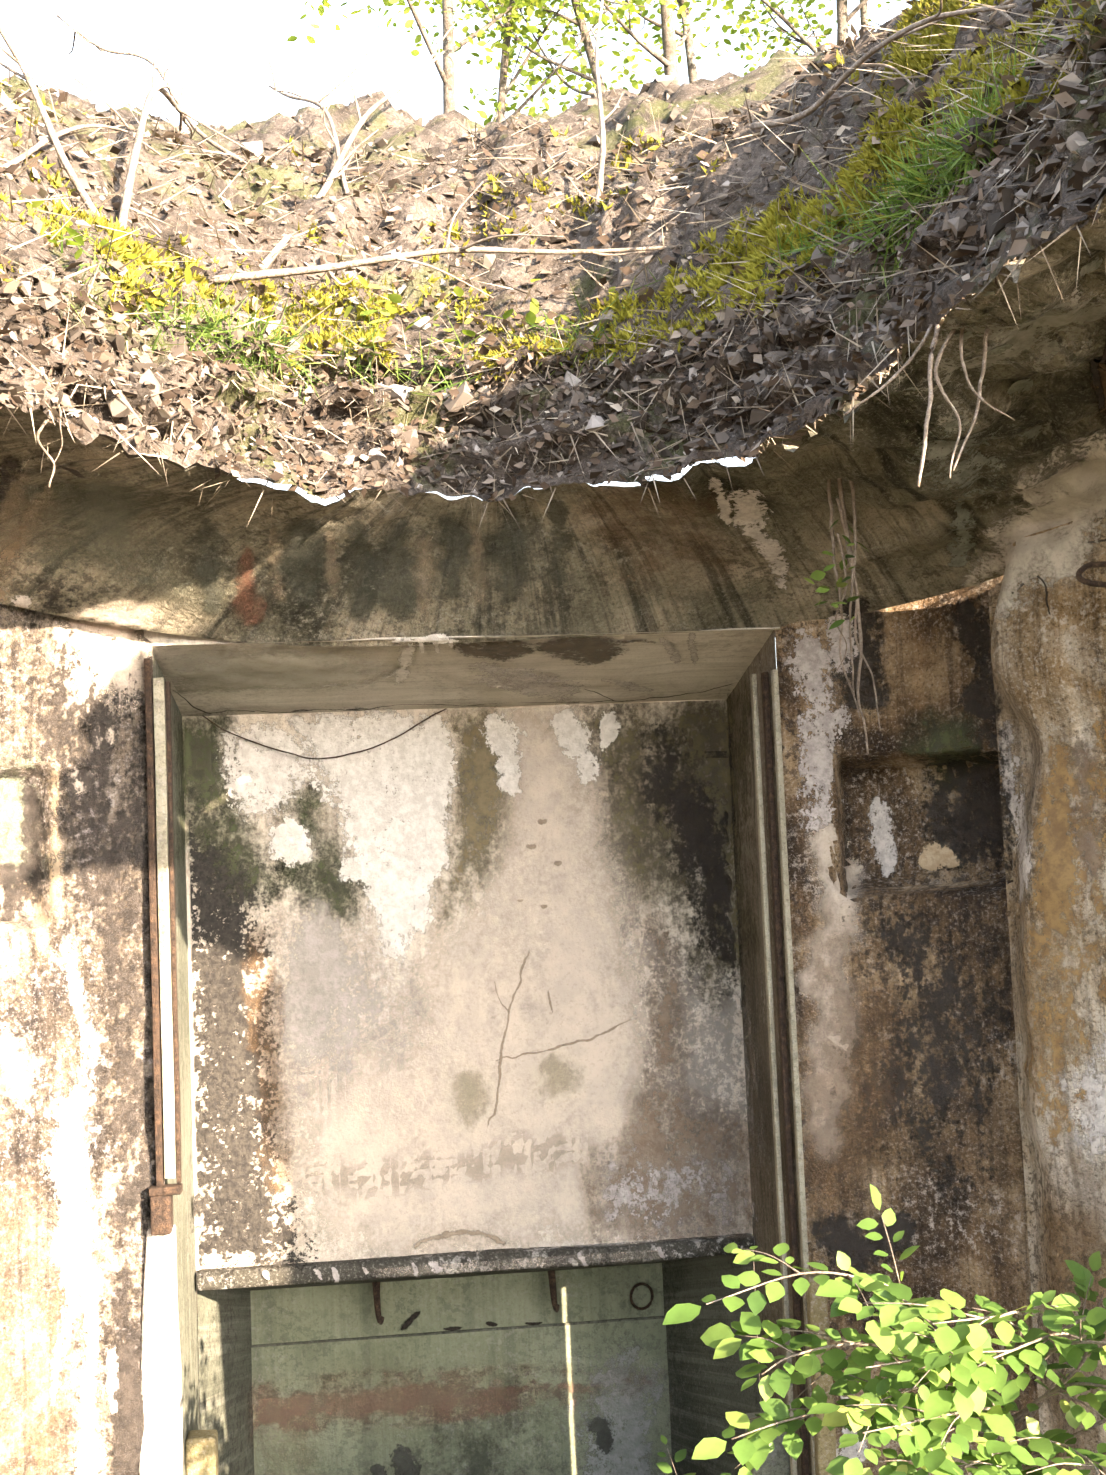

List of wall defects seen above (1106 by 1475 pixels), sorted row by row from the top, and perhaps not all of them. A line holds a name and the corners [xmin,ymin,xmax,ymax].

leakage [275,518,328,607]
leakage [346,518,422,621]
leakage [438,518,472,599]
leakage [492,500,572,603]
leakage [478,712,528,797]
leakage [550,708,621,787]
leakage [783,596,1106,1274]
leakage [189,788,423,1283]
flaking render [219,708,649,1267]
crack [488,952,637,1125]
leakage [0,770,144,1475]